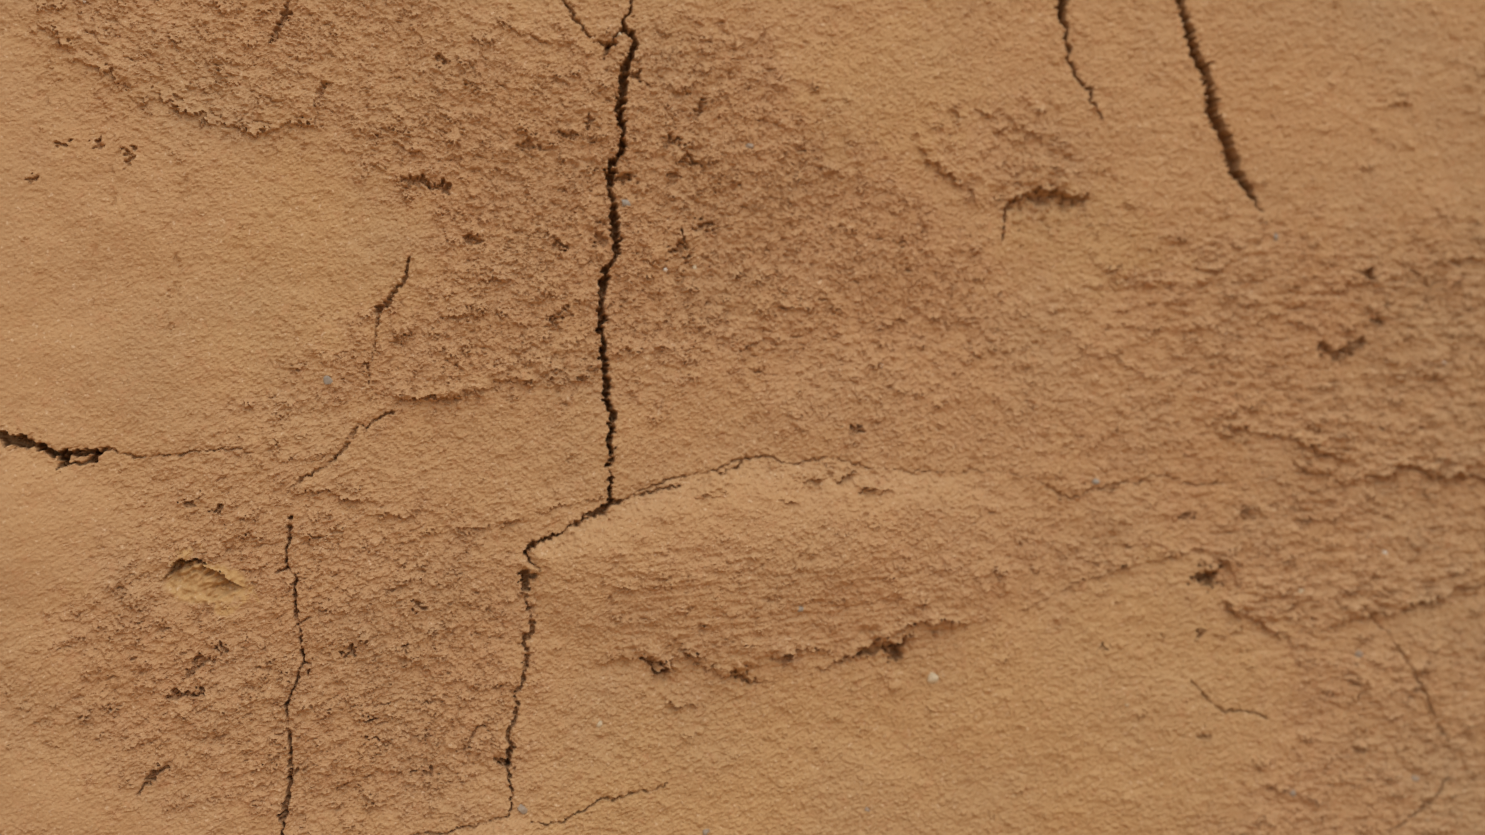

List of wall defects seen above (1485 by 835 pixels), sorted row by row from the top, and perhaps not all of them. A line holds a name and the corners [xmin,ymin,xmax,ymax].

crack [1175,0,1267,214]
crack [0,430,243,471]
crack [269,253,413,835]
crack [412,0,1237,835]